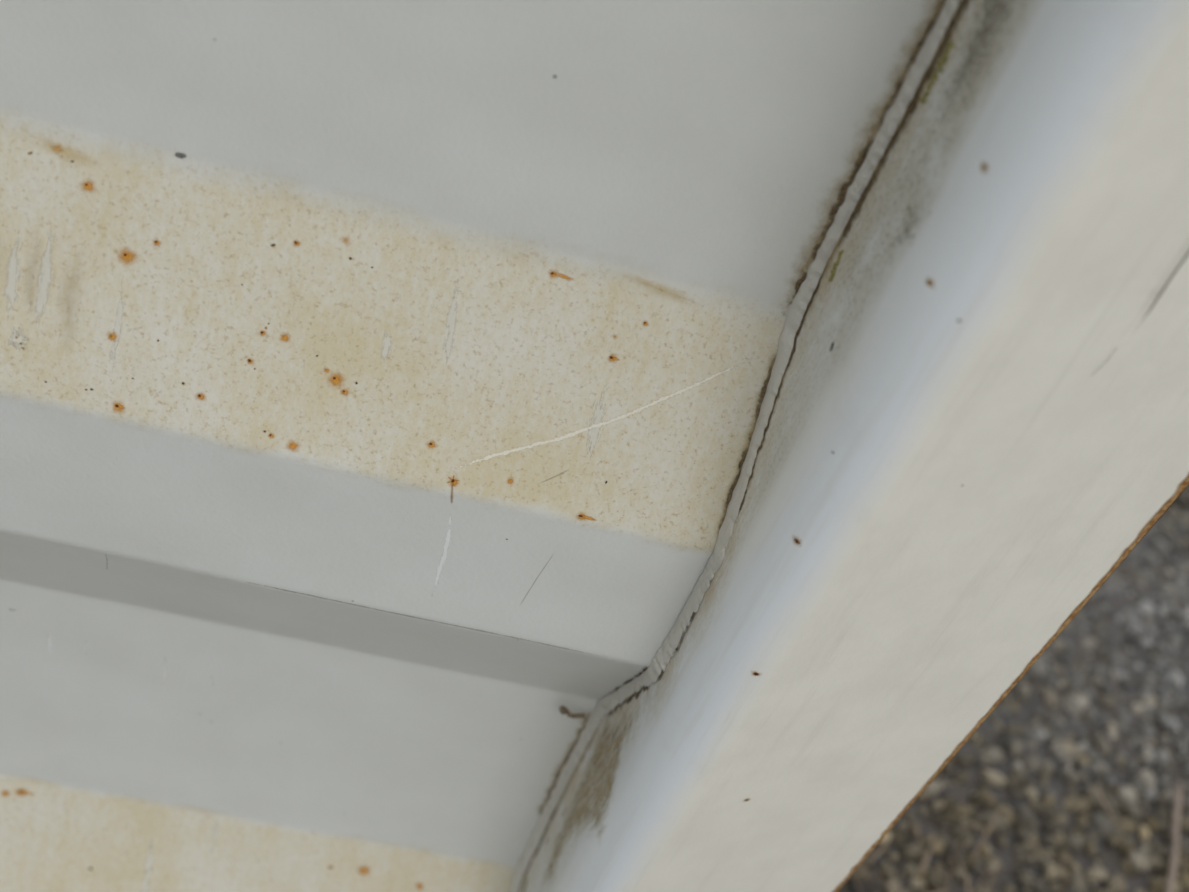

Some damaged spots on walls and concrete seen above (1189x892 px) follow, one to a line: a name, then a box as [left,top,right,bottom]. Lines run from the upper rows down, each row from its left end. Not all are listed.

rust [121,251,134,263]
crack [1118,238,1189,342]
rust [325,369,358,395]